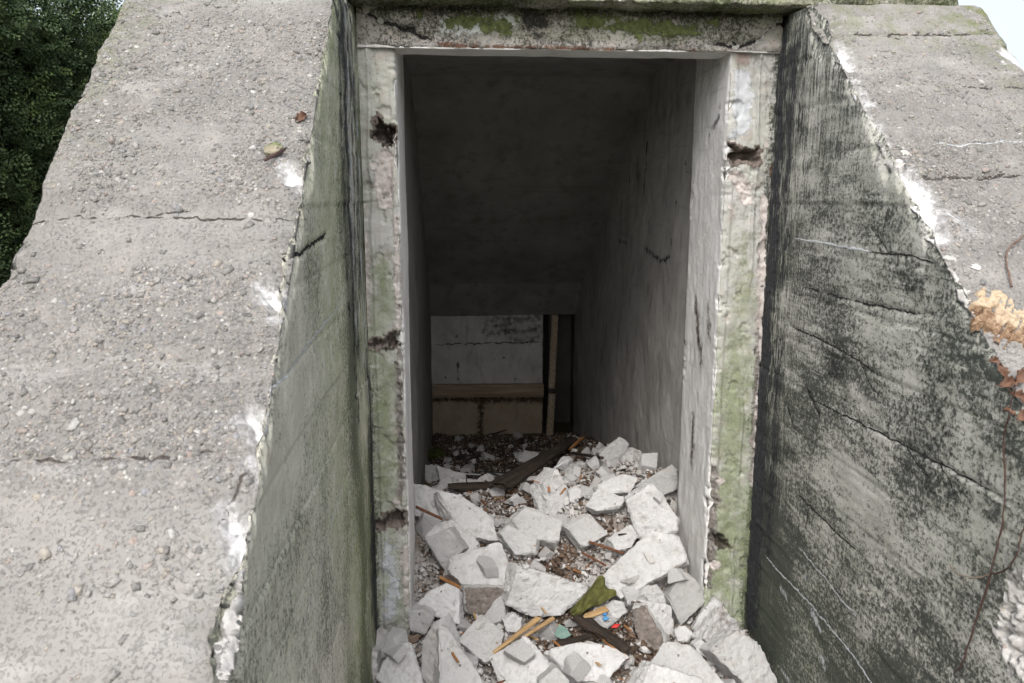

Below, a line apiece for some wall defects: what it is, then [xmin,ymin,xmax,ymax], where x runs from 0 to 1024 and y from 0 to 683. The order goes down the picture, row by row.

damp [523,12,552,39]
crack [32,211,294,225]
crack [283,232,326,262]
damp [879,199,931,310]
crack [916,173,1024,181]
spalling [363,111,409,533]
peeling [725,141,769,487]
damp [735,13,871,683]
spalling [241,407,269,469]
crack [787,388,997,494]
damp [888,345,1009,531]
spalling [214,503,251,681]